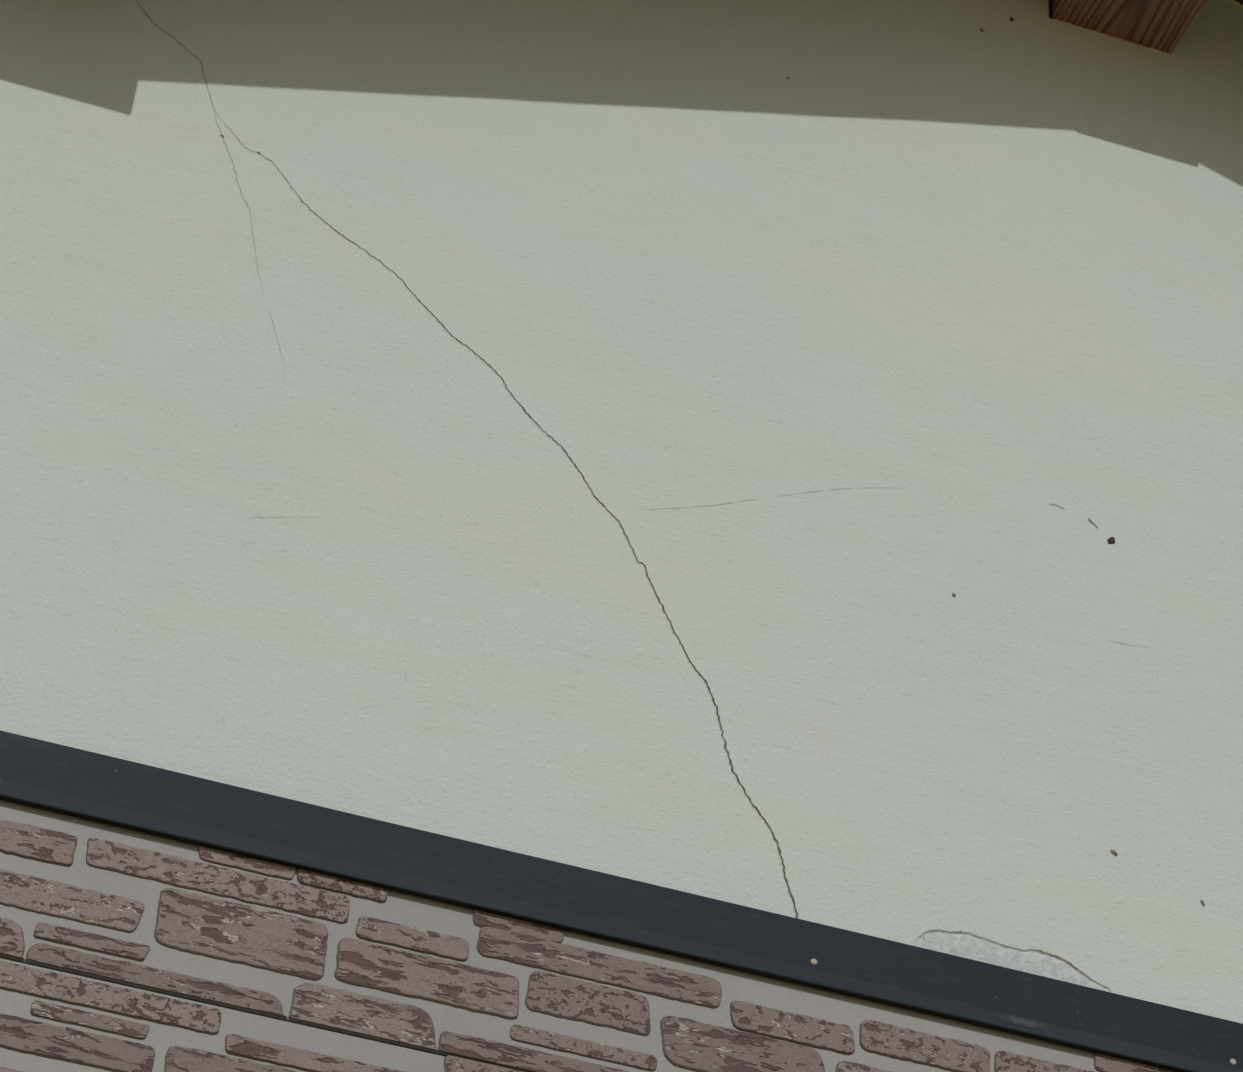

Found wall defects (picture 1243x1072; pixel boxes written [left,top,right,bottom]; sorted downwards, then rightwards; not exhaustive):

crack [136,0,911,919]
spalling [915,926,1110,992]